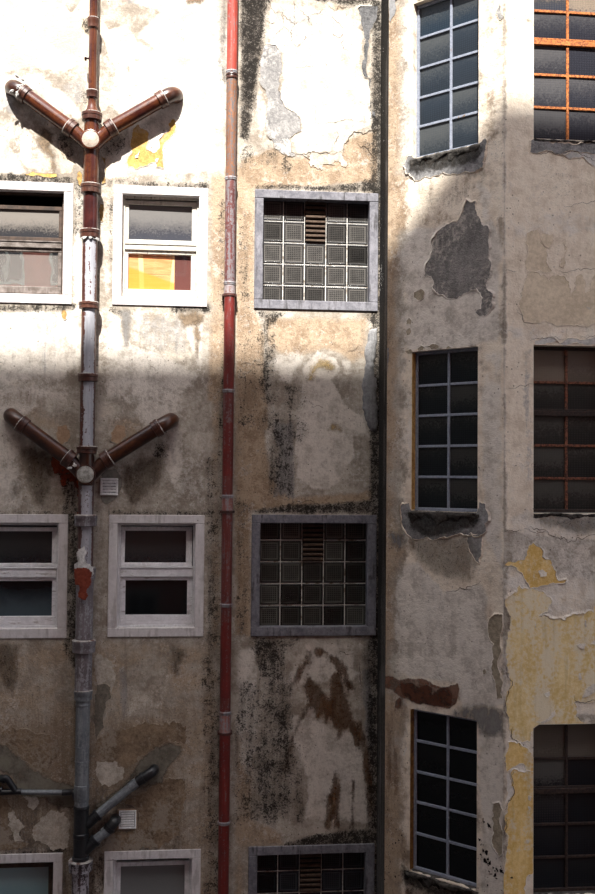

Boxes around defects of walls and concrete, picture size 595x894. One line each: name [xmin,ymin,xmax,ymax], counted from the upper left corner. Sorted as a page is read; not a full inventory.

flaking render [258,44,348,170]
peeling [126,117,178,170]
flaking render [413,197,496,317]
peeling [518,229,595,346]
flaking render [400,502,491,565]
peeling [482,542,595,894]
flaking render [0,796,71,852]
damp [384,861,472,894]
damp [478,838,513,892]